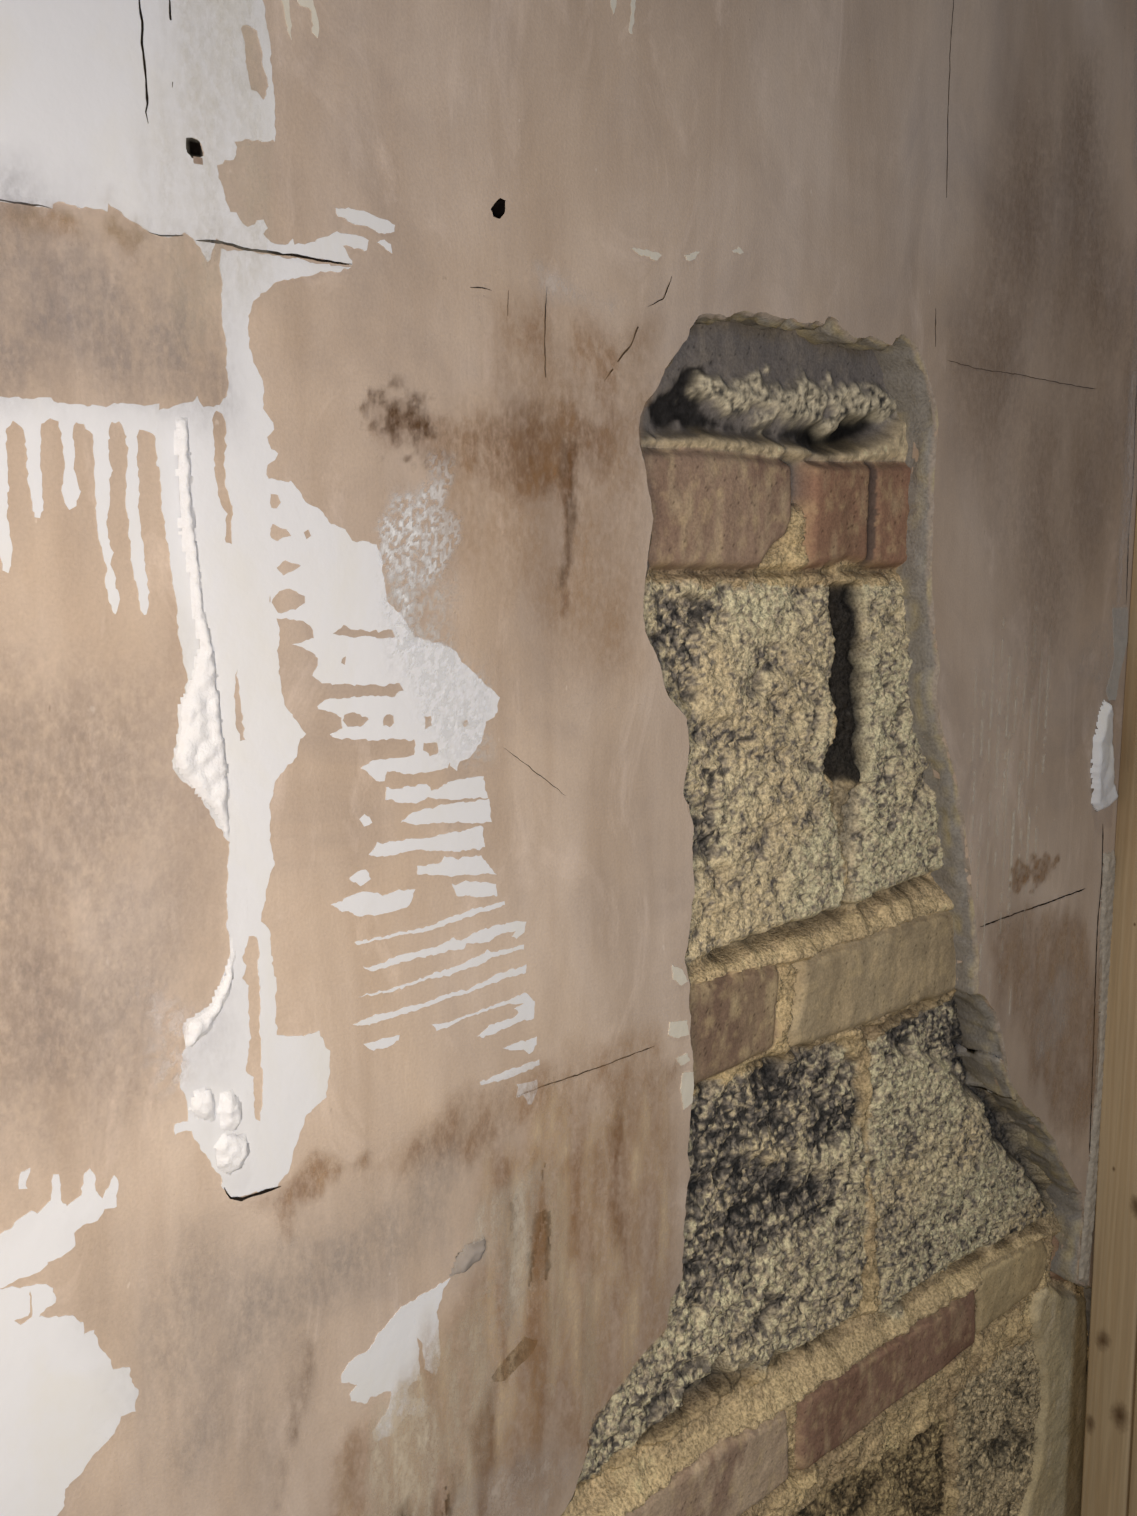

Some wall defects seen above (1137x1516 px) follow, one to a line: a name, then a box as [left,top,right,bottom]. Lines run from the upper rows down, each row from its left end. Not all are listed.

peeling [0,0,540,1197]
flaking render [560,311,1116,1516]
peeling [0,1168,139,1516]
peeling [341,1235,486,1441]
spalling [491,1337,538,1382]
damp [373,1099,669,1516]